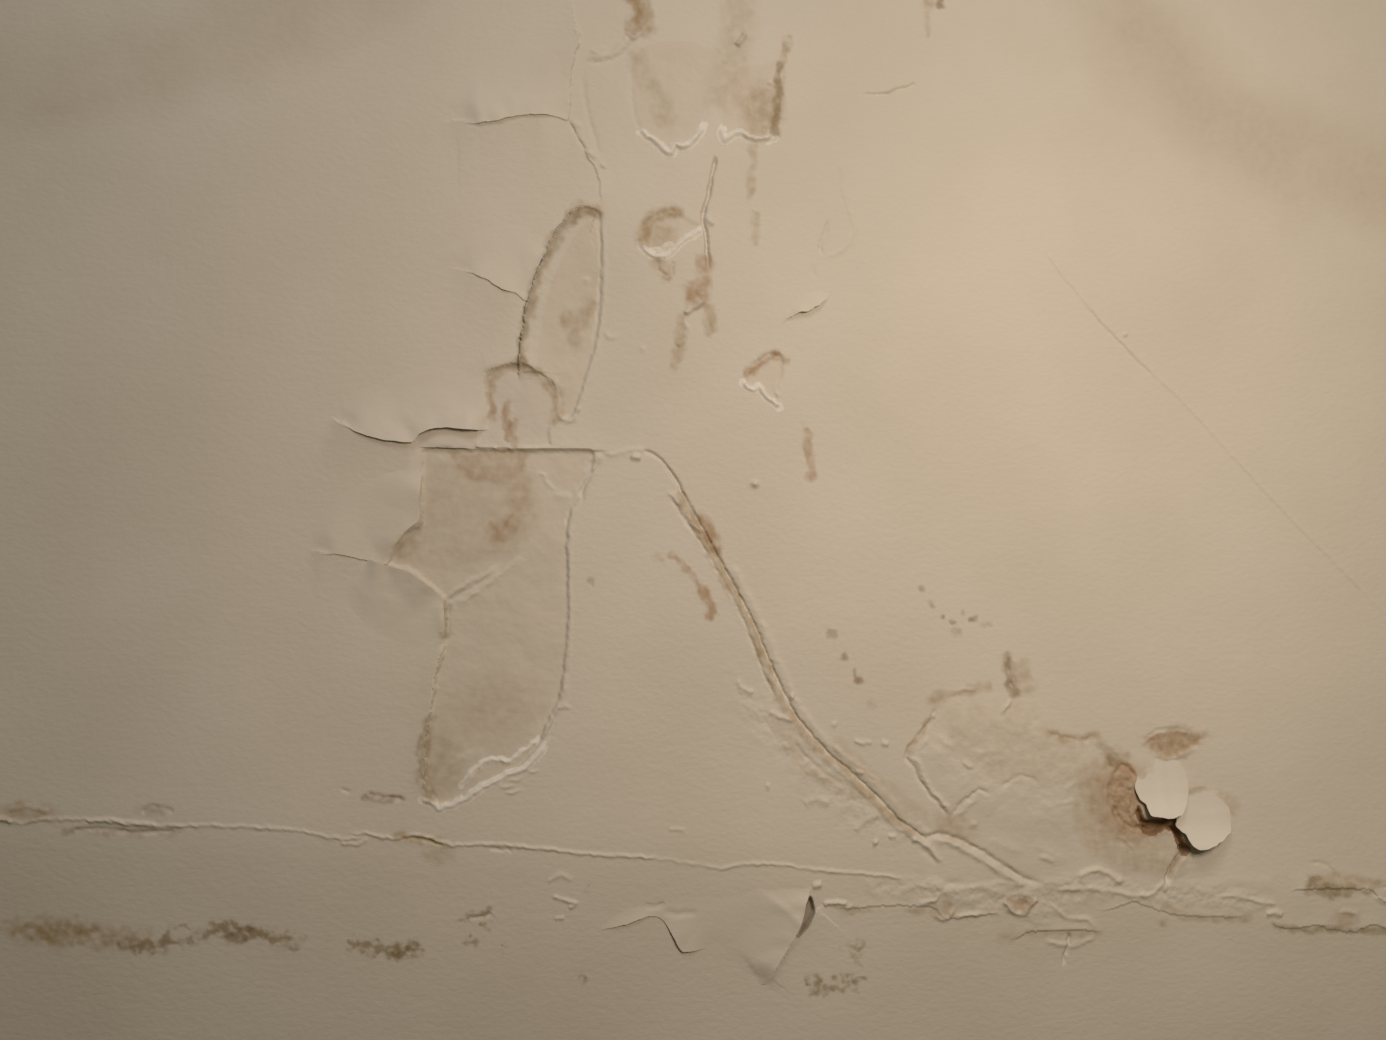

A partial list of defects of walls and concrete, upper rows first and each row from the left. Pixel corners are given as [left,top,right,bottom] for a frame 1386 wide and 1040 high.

peeling [310,205,626,814]
crack [0,443,1050,924]
spalling [1083,724,1242,899]
crack [1167,867,1289,920]
peeling [1270,857,1386,933]